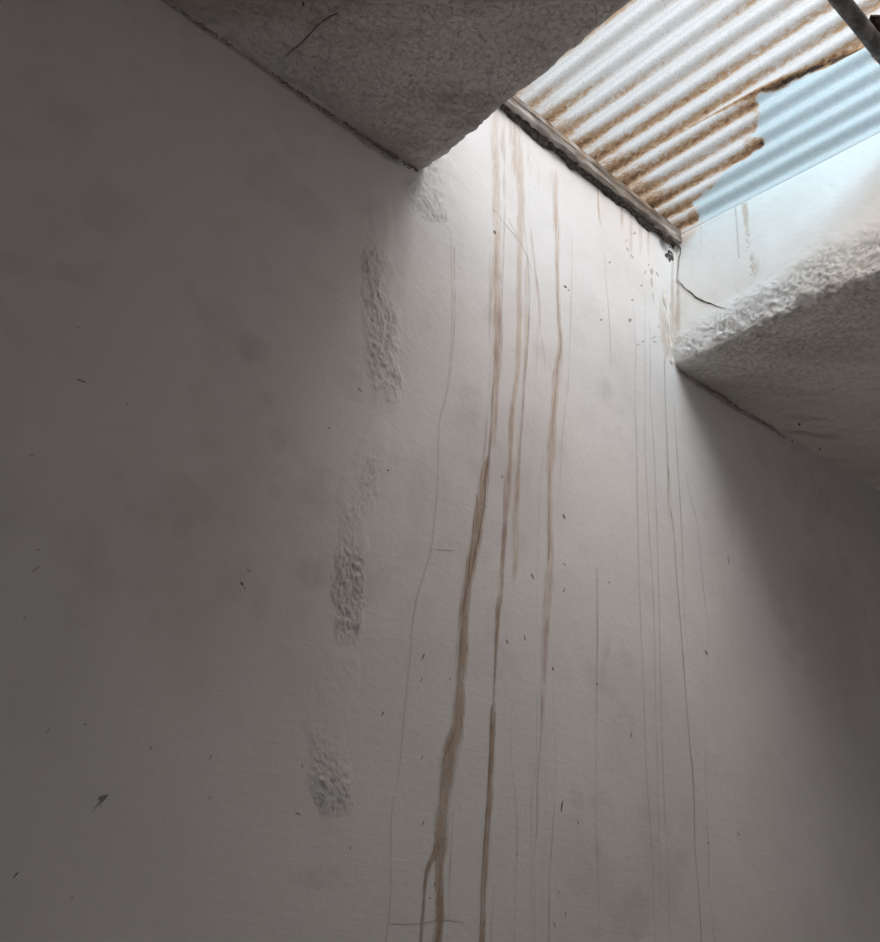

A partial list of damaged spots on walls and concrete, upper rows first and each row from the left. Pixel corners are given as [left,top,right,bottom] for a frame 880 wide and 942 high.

crack [677,245,722,308]